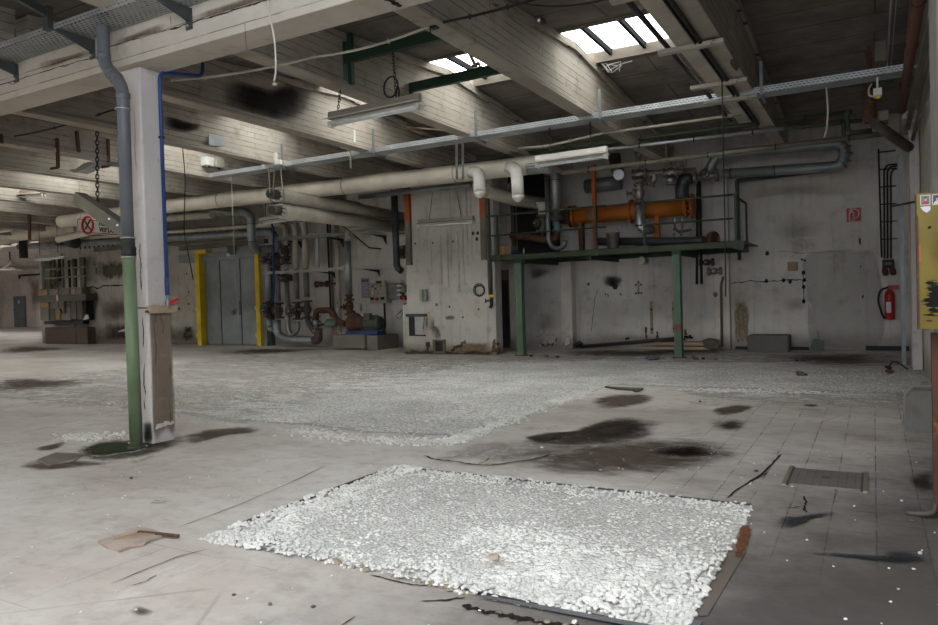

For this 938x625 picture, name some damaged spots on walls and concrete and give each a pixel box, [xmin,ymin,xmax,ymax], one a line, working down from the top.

crack [110,0,267,47]